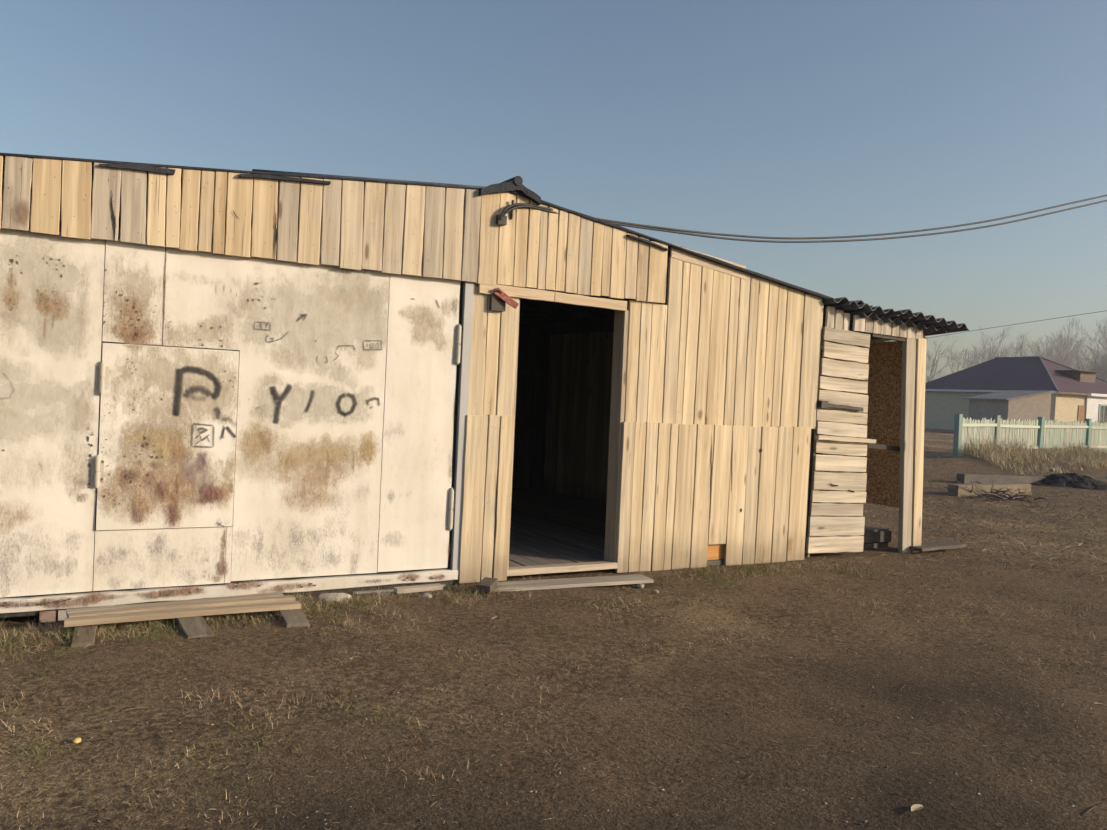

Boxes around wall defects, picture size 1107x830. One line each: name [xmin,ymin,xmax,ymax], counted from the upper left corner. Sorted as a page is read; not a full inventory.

rust [114,299,153,346]
rust [105,446,229,525]
rust [243,425,377,505]
rust [0,592,114,608]
rust [145,587,203,598]
rust [214,539,316,593]